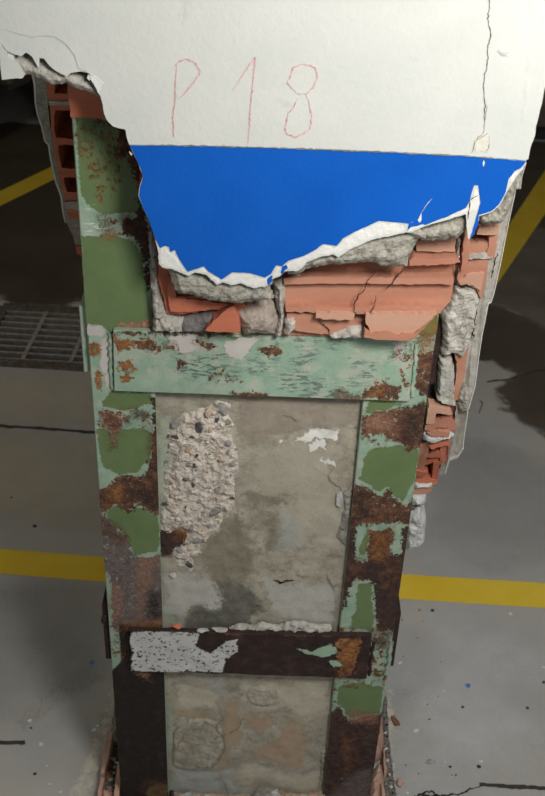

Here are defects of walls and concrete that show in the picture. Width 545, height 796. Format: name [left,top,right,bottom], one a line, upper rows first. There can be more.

flaking render [16,53,103,98]
crack [472,0,508,152]
corrosion [74,118,152,297]
spalling [160,400,239,578]
peeling [296,427,339,467]
flaking render [158,167,524,303]
crack [353,267,406,328]
corrosion [327,326,437,452]
water stain [479,215,545,437]
water stain [509,141,545,223]
corrosion [95,396,212,796]
corrosion [212,484,413,796]